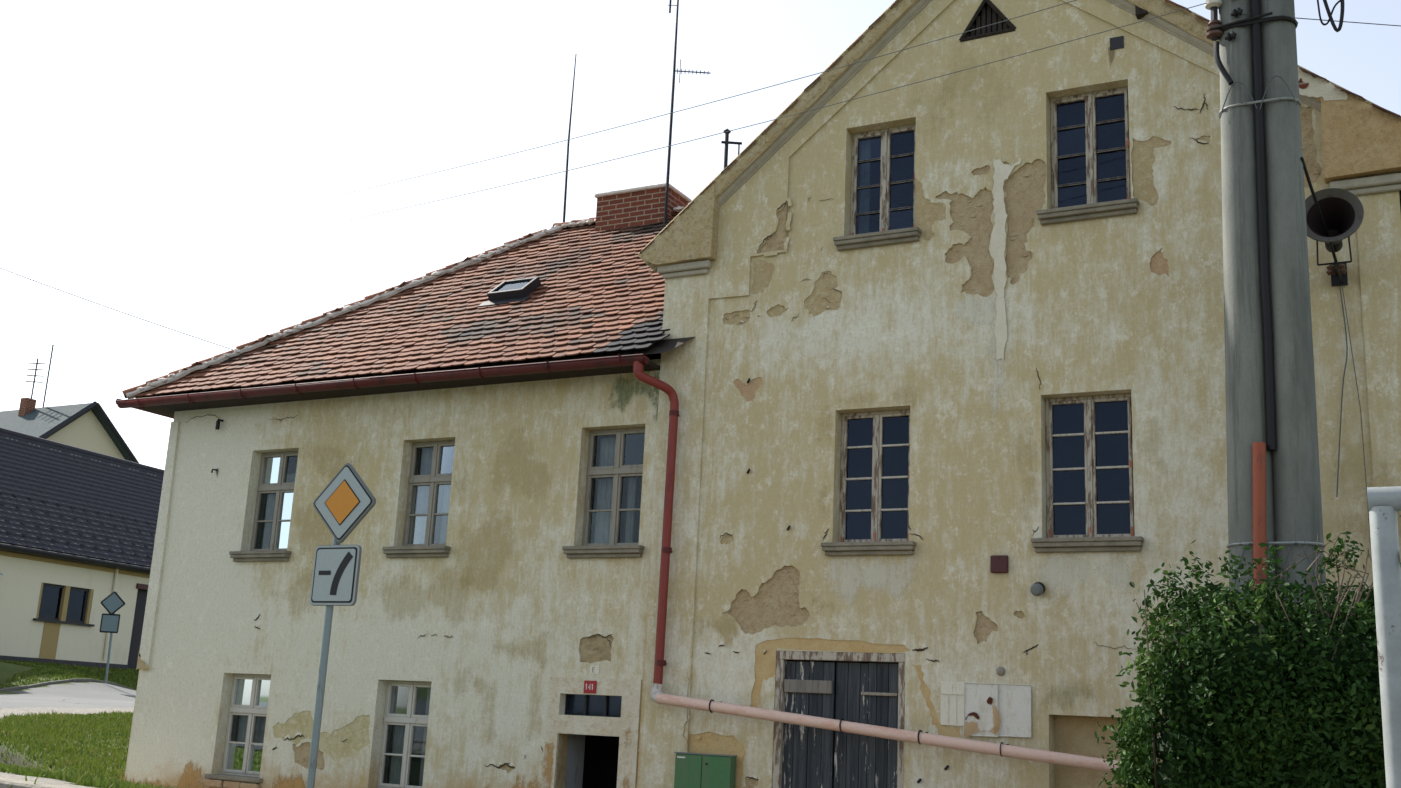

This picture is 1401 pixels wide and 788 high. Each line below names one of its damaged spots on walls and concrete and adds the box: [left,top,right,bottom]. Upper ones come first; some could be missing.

flaking render [1130,134,1171,206]
flaking render [915,155,1047,297]
flaking render [719,197,842,327]
flaking render [731,374,765,402]
peeling [575,630,618,666]
flaking render [723,560,961,737]
flaking render [969,605,1029,648]
flaking render [272,708,372,772]
leakage [121,761,204,788]
leakage [272,775,305,788]